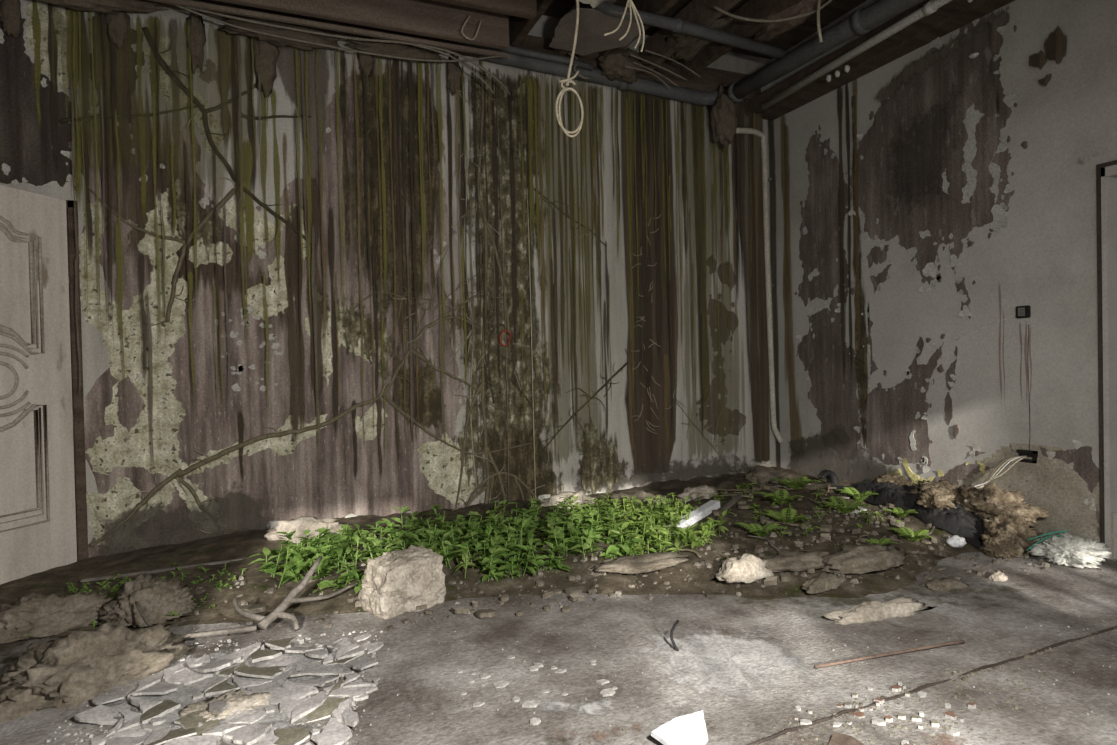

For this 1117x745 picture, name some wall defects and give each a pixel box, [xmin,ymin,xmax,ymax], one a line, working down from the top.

water stain [101,413,270,557]
peeling [0,18,480,558]
water stain [32,0,919,503]
peeling [794,7,1028,485]